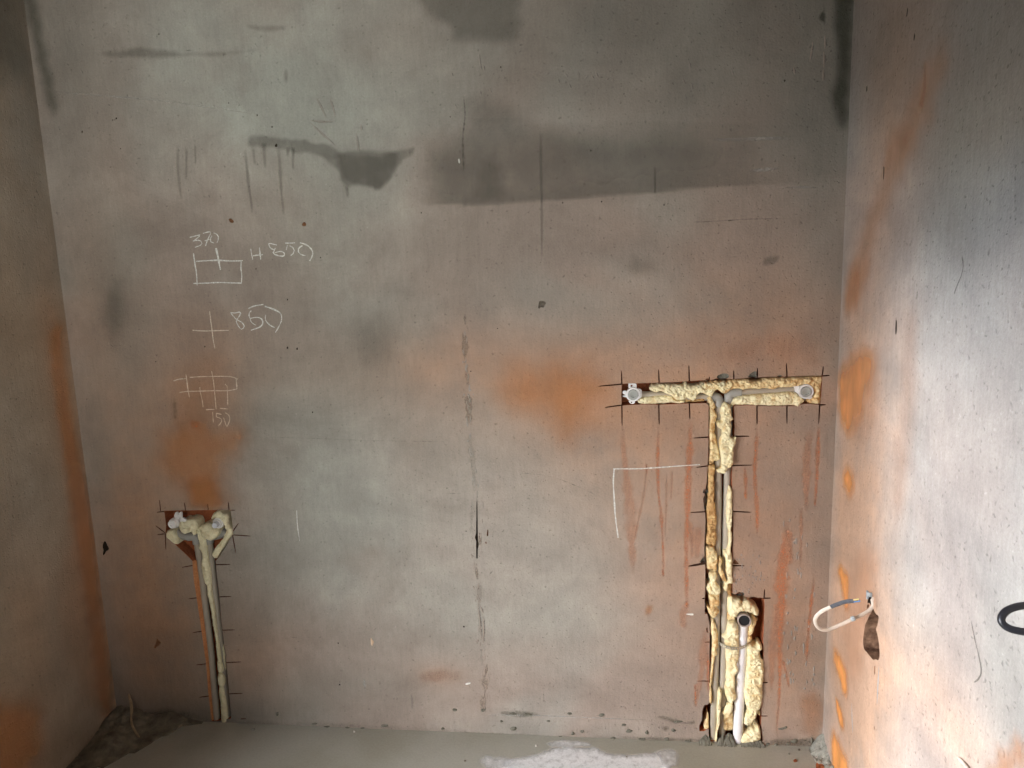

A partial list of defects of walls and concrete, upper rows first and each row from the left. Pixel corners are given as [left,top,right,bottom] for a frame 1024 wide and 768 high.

water stain [834,0,853,120]
crack [462,317,490,709]